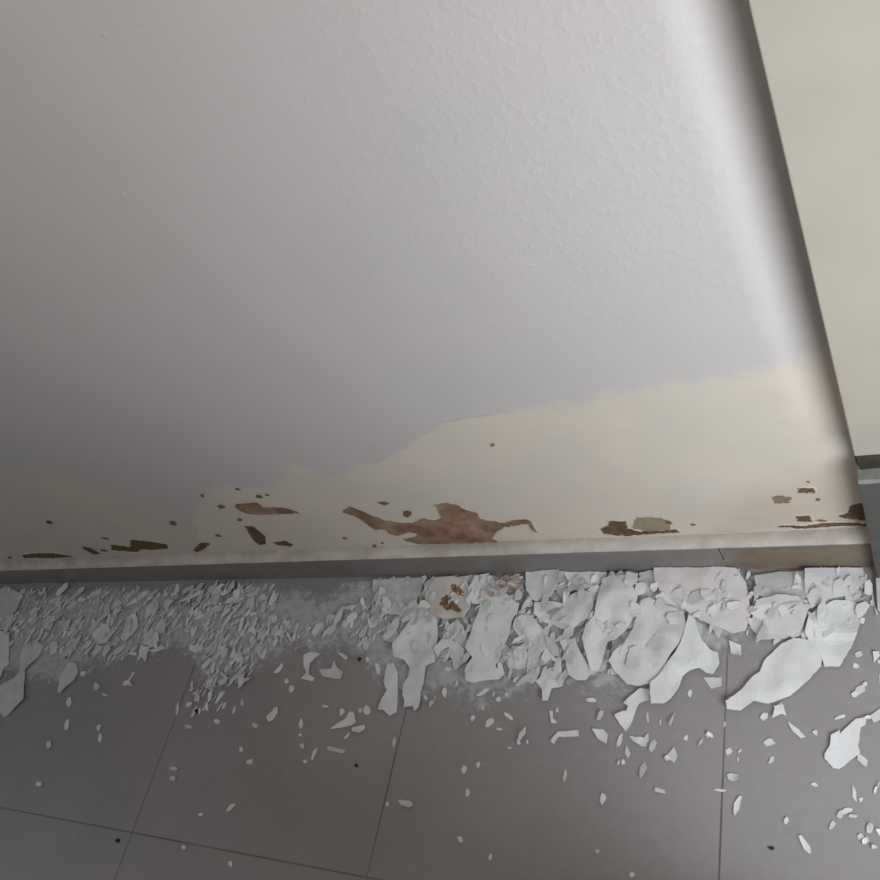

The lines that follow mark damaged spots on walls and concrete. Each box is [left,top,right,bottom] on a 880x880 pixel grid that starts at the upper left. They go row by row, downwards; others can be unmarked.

damp [0,451,210,561]
peeling [7,334,867,559]
damp [632,517,672,532]
damp [687,456,867,534]